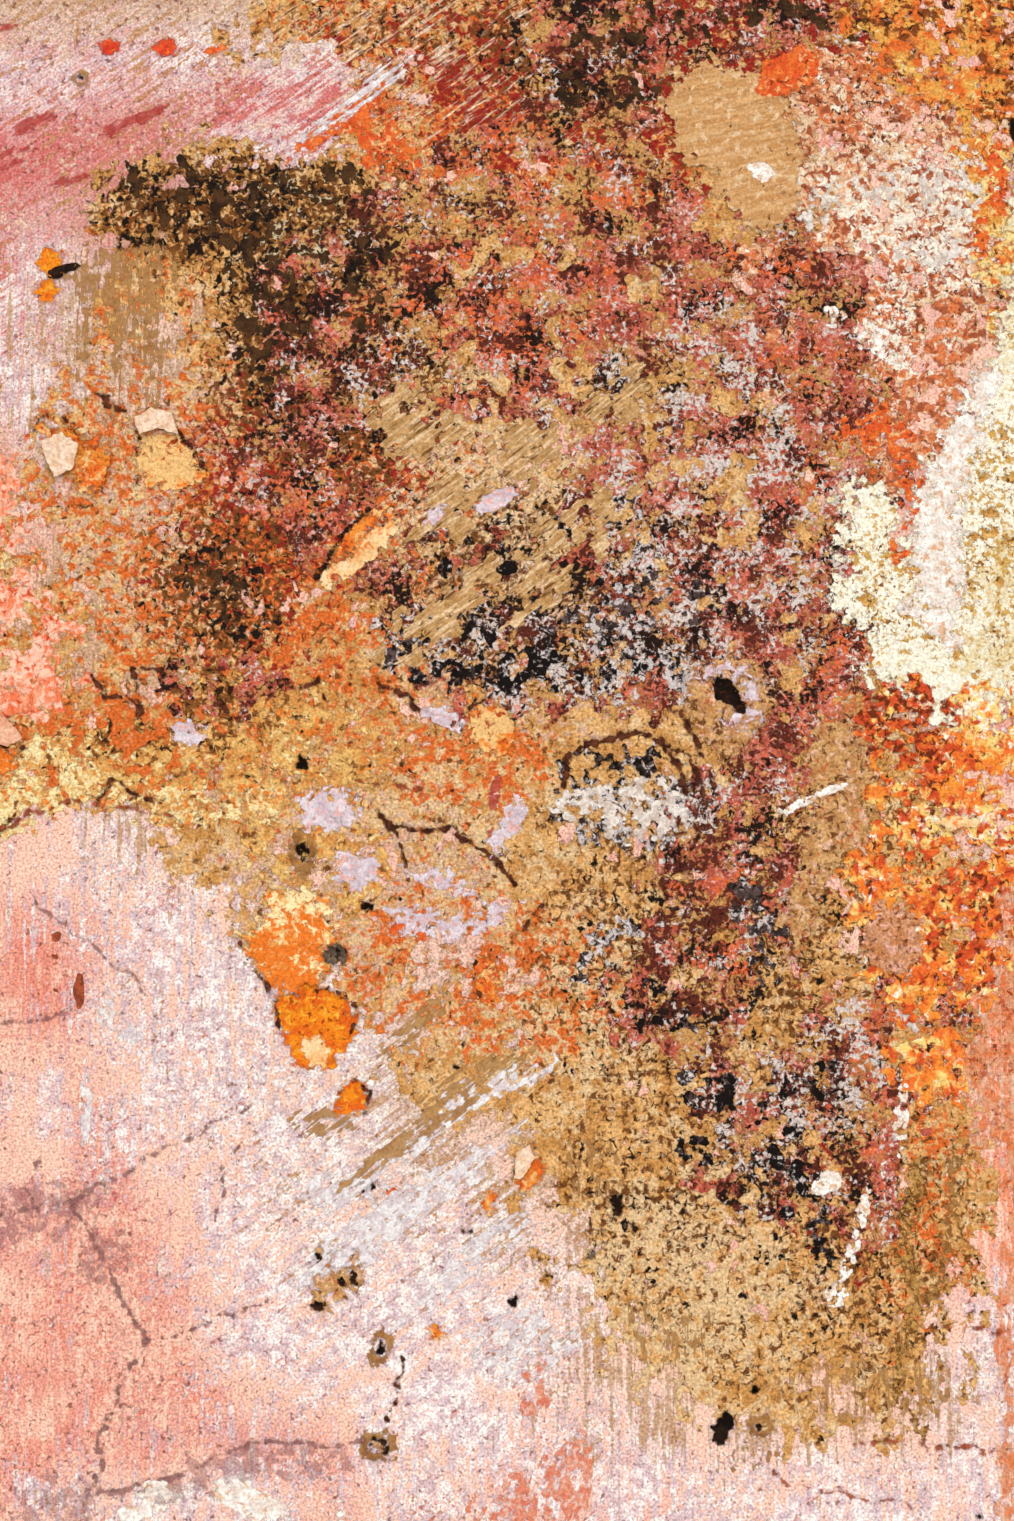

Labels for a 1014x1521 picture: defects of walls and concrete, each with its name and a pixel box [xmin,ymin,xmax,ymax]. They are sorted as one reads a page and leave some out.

rust [832,396,926,566]
spalling [875,730,929,789]
spalling [30,764,120,817]
rust [486,776,502,837]
crack [355,779,545,945]
rust [385,921,429,944]
rust [830,672,1014,1521]
spalling [503,1192,524,1215]
spalling [524,1246,559,1291]
crack [0,1105,405,1521]
rust [367,1325,394,1367]
spalling [958,1349,979,1406]